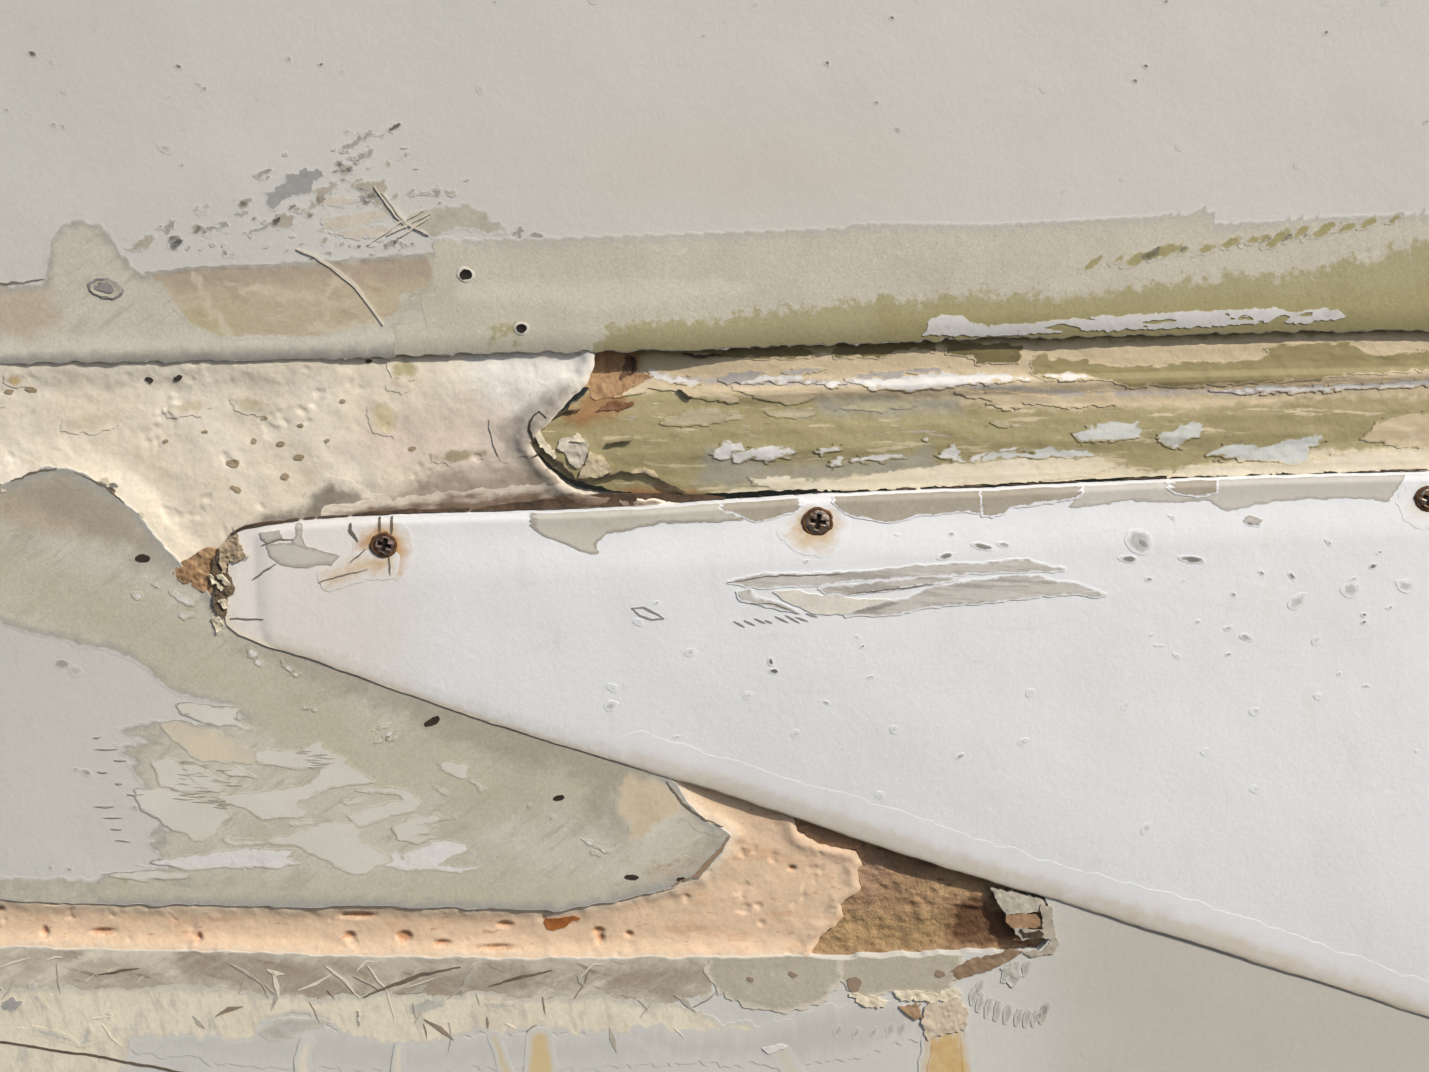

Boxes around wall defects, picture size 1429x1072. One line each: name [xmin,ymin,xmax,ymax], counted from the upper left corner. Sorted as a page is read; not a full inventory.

rust [317,517,414,592]
rust [777,502,850,558]
peeling [727,531,1107,618]
spalling [1118,529,1154,563]
spalling [1178,555,1206,582]
spalling [1288,572,1309,610]
spalling [1340,550,1383,625]
rust [1395,481,1429,529]
peeling [0,467,731,911]
spalling [794,818,1060,1041]